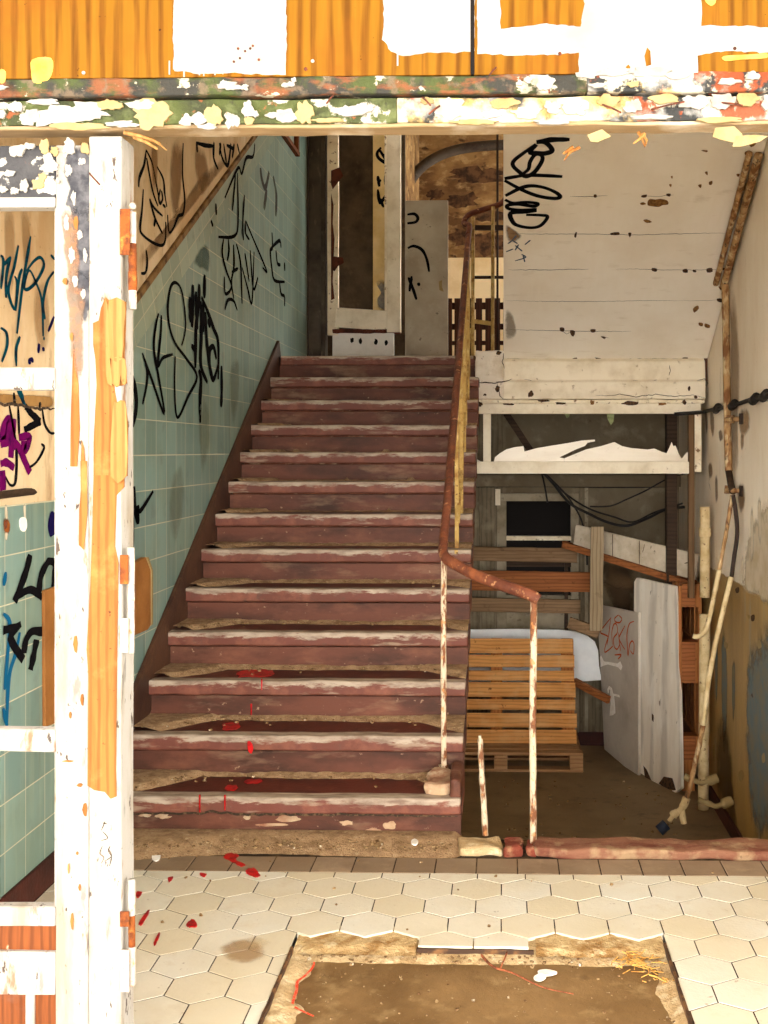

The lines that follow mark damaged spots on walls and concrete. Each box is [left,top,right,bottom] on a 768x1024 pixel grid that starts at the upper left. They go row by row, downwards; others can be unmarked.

peeling [0,80,375,195]
peeling [420,48,768,155]
peeling [69,297,128,799]
spalling [295,926,418,956]
spalling [534,929,665,982]